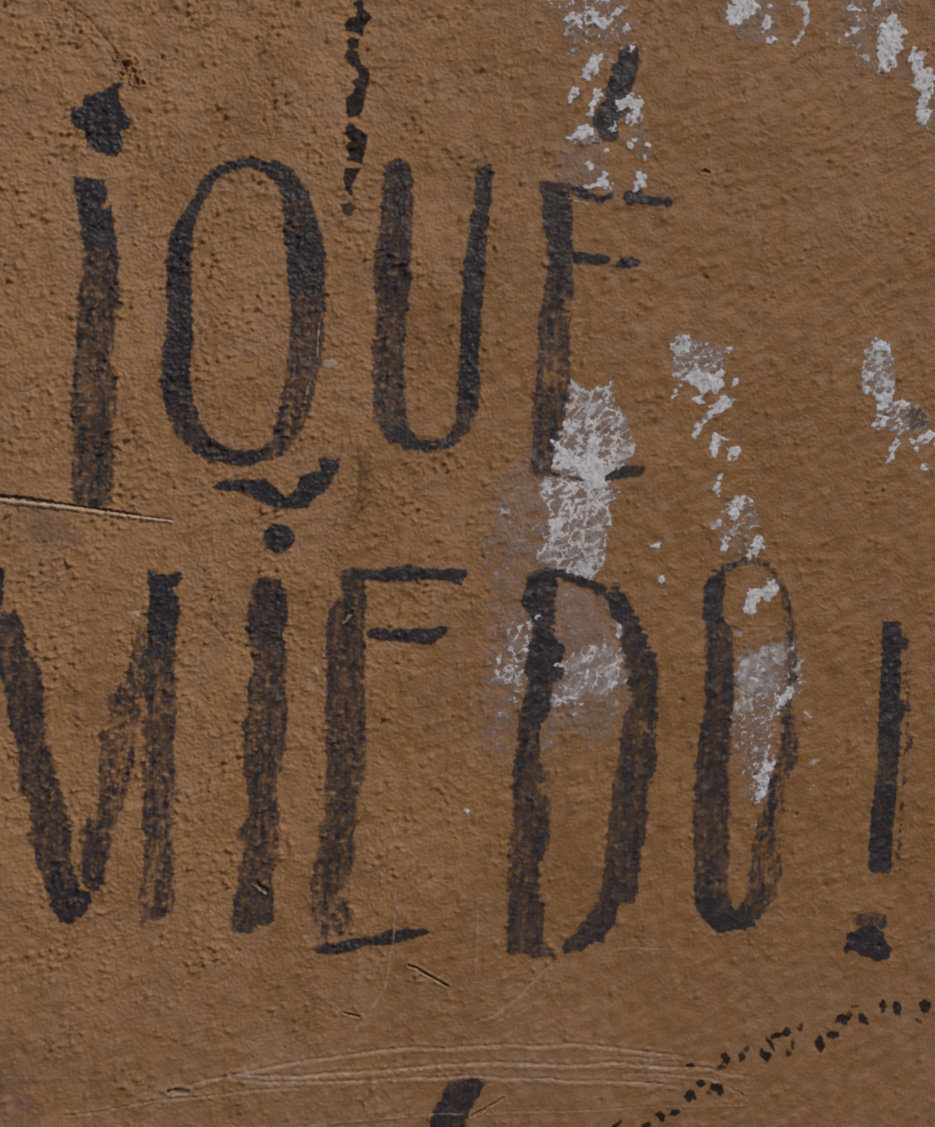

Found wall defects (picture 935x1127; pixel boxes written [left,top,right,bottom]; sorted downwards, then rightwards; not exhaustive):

peeling [562,0,630,36]
peeling [726,0,778,44]
peeling [847,0,935,125]
peeling [566,53,651,192]
peeling [862,337,910,430]
crack [0,494,174,523]
peeling [541,379,634,580]
peeling [670,334,753,551]
peeling [885,430,935,471]
peeling [746,536,766,560]
peeling [743,578,780,614]
peeling [740,741,776,803]